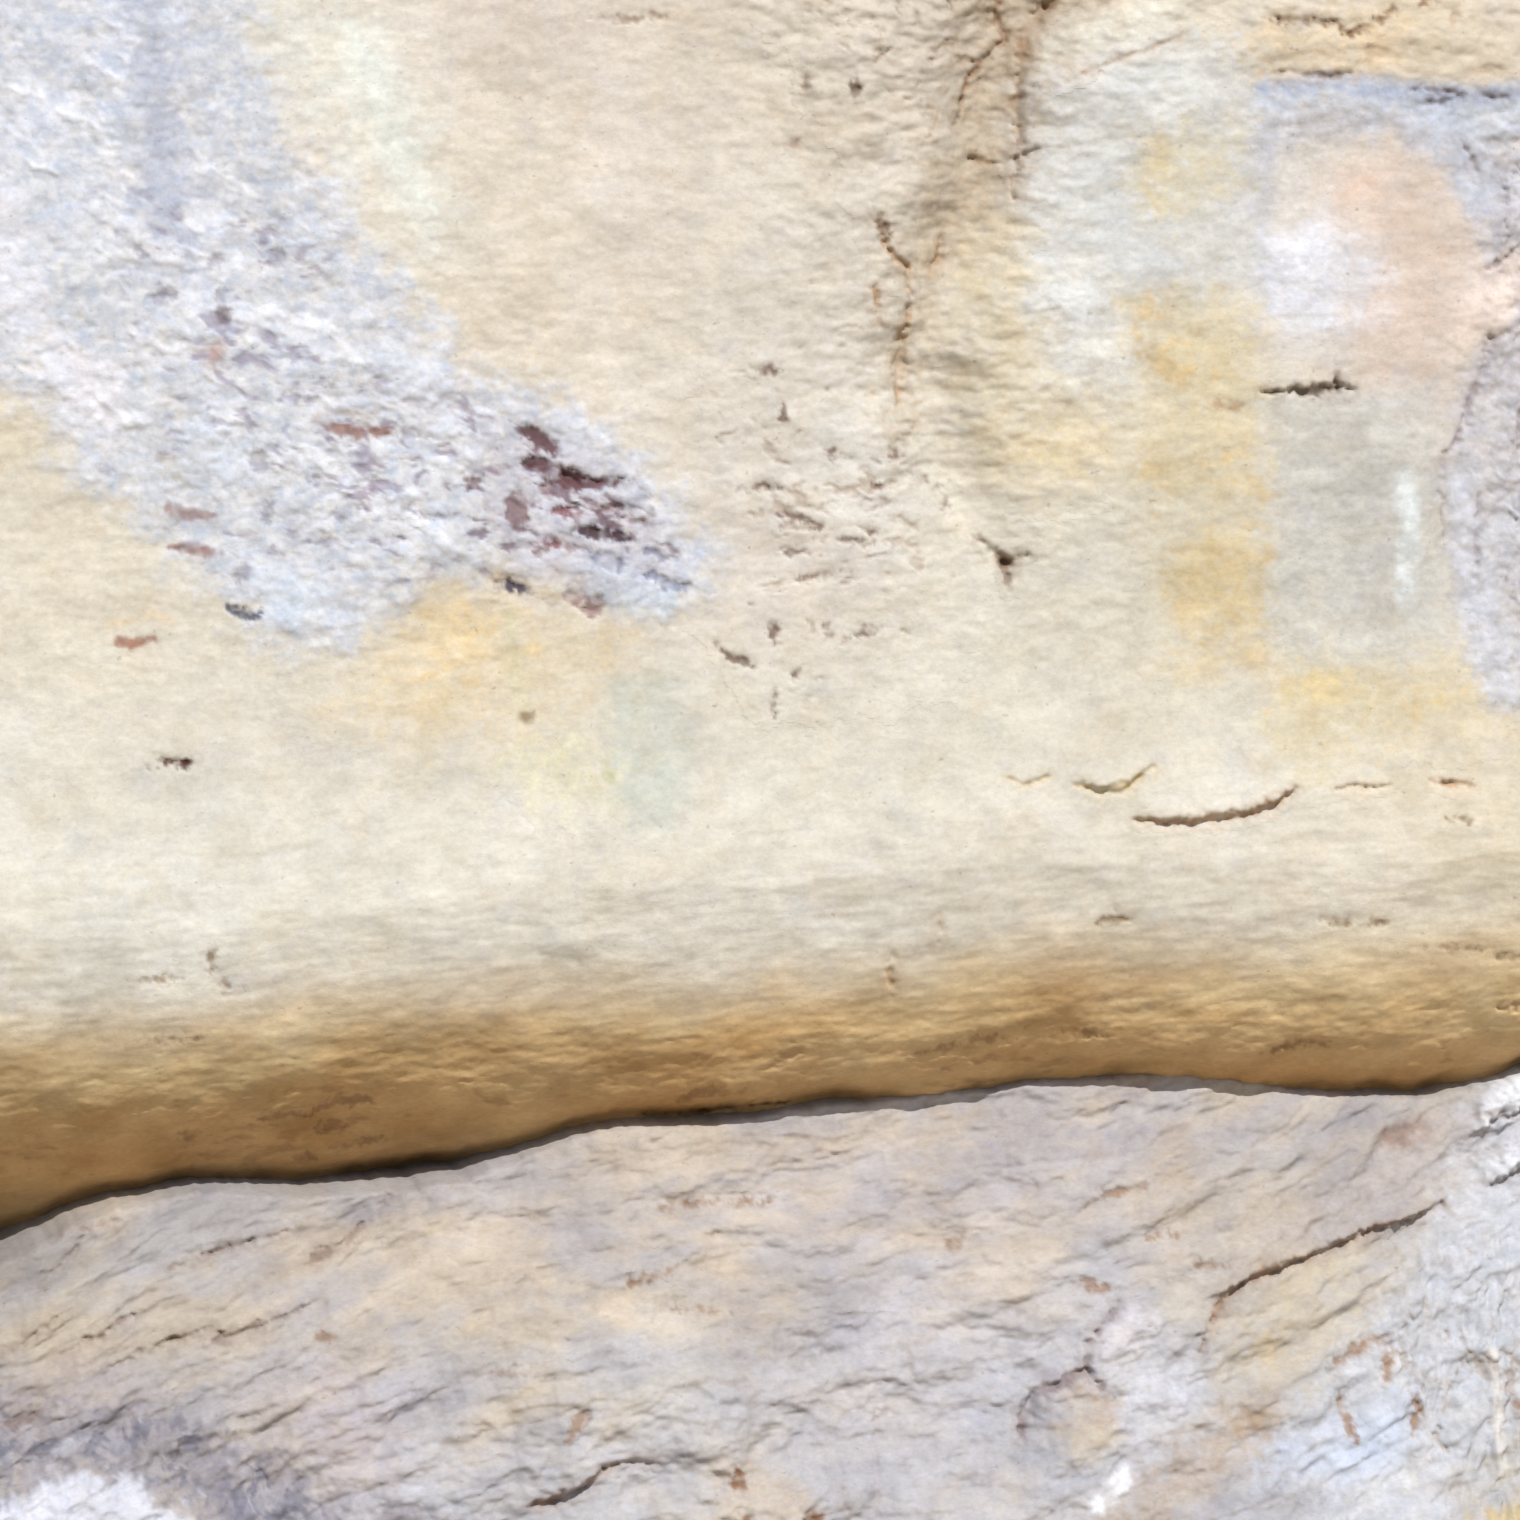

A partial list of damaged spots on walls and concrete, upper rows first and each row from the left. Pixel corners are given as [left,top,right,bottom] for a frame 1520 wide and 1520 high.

peeling [1212,0,1520,266]
crack [858,205,954,413]
peeling [1450,340,1520,715]
crack [1000,756,1481,839]
crack [1192,1099,1520,1366]